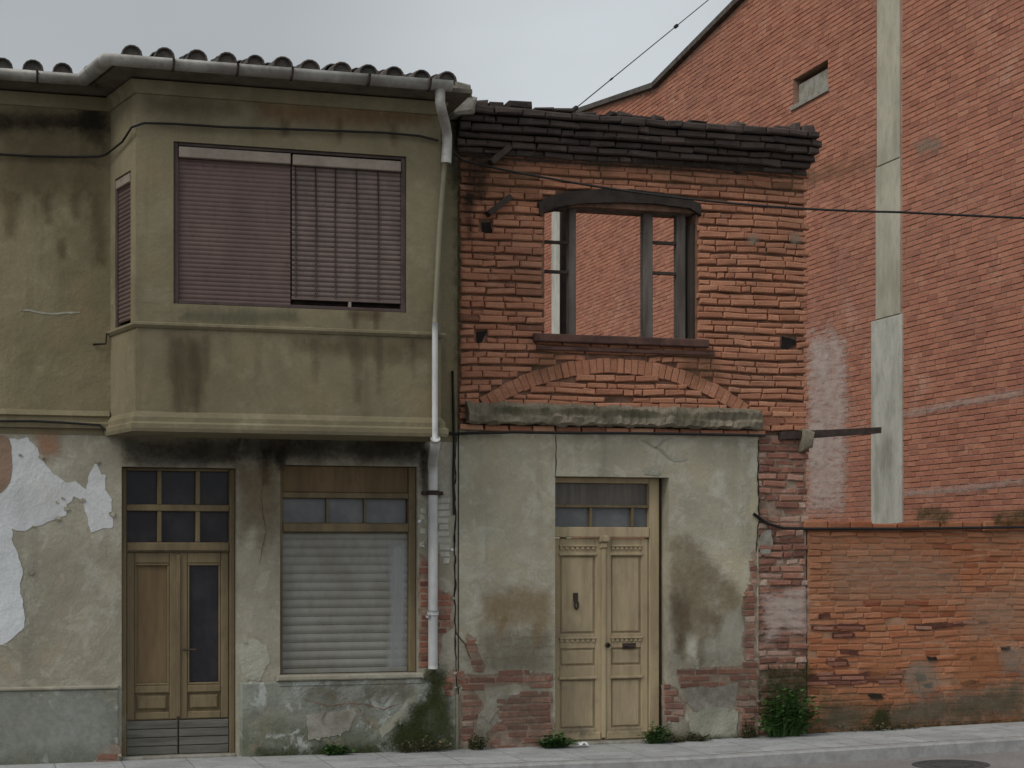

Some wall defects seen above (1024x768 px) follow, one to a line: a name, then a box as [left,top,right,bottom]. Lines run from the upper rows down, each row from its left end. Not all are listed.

peeling [0,434,115,646]
peeling [306,709,354,741]
peeling [378,690,418,738]
spalling [417,493,555,749]
spalling [661,548,906,737]